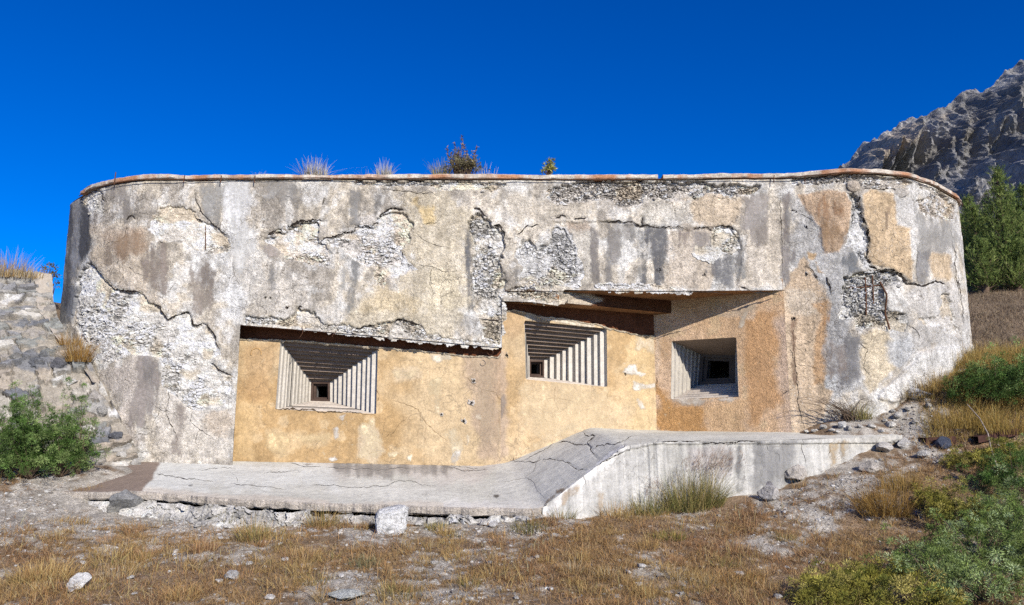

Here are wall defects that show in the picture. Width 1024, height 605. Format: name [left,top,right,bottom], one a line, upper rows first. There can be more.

spalling [73,265,232,411]
crack [91,215,235,378]
crack [194,193,230,241]
spalling [244,209,595,362]
damp [590,217,668,285]
spalling [545,181,760,208]
spalling [692,226,741,276]
spalling [790,175,963,341]
crack [846,188,964,323]
damp [129,356,160,427]
crack [151,391,445,490]